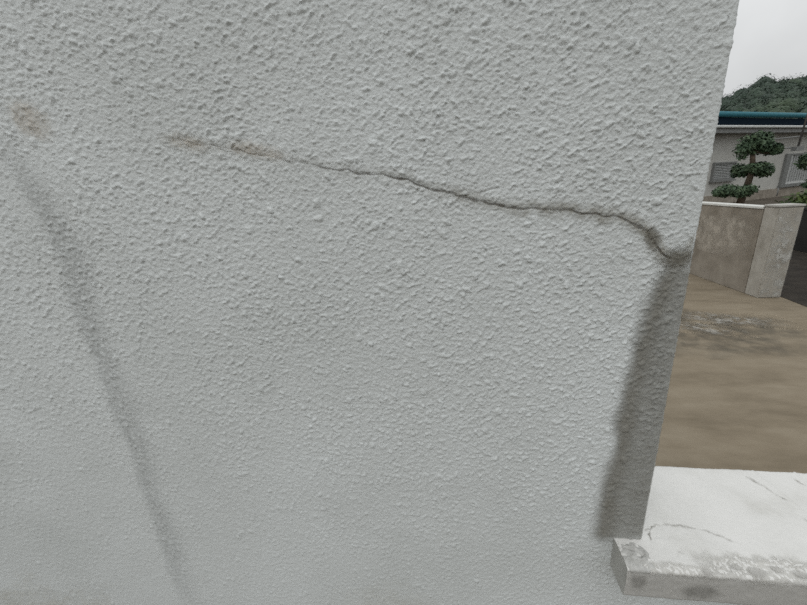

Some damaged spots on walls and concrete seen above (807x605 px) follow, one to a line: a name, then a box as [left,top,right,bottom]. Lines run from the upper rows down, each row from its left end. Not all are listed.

crack [322,167,448,192]
crack [470,198,534,209]
crack [572,209,688,263]